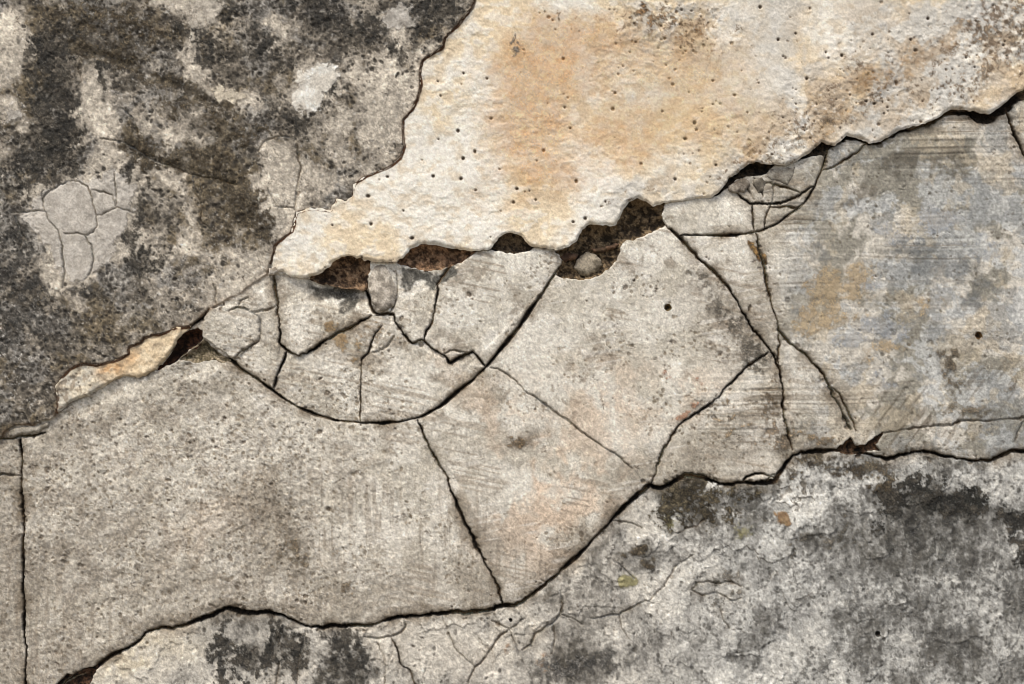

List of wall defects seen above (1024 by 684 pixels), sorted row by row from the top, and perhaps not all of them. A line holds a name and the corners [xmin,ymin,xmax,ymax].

water stain [279,0,465,78]
water stain [0,0,309,352]
water stain [319,81,349,110]
peeling [269,0,1024,291]
peeling [9,325,231,436]
crack [98,90,1024,684]
crack [0,432,46,684]
water stain [648,472,762,534]
water stain [686,268,1024,658]
water stain [204,613,379,684]
water stain [800,653,831,678]